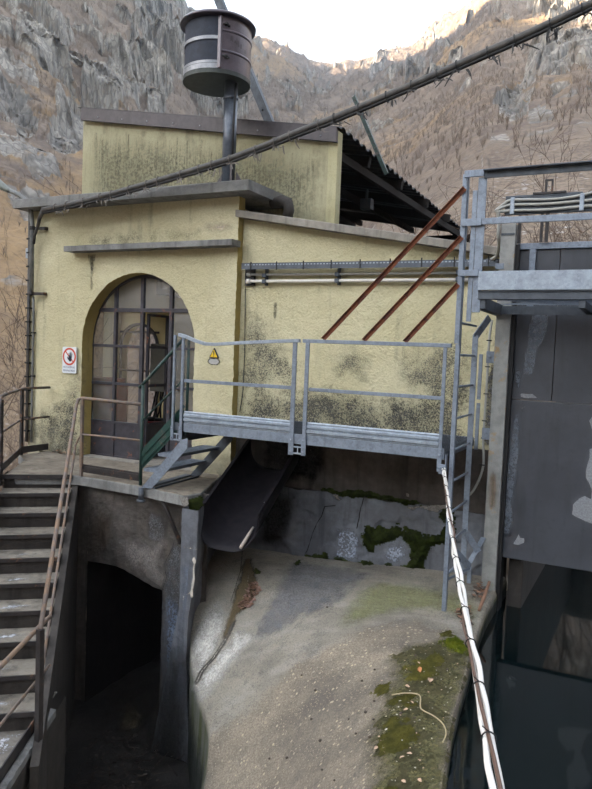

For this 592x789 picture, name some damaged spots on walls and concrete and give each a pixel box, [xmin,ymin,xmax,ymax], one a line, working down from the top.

leakage [245,326,466,436]
peeling [515,320,547,398]
peeling [504,417,519,534]
peeling [572,448,592,524]
leakage [149,557,251,761]